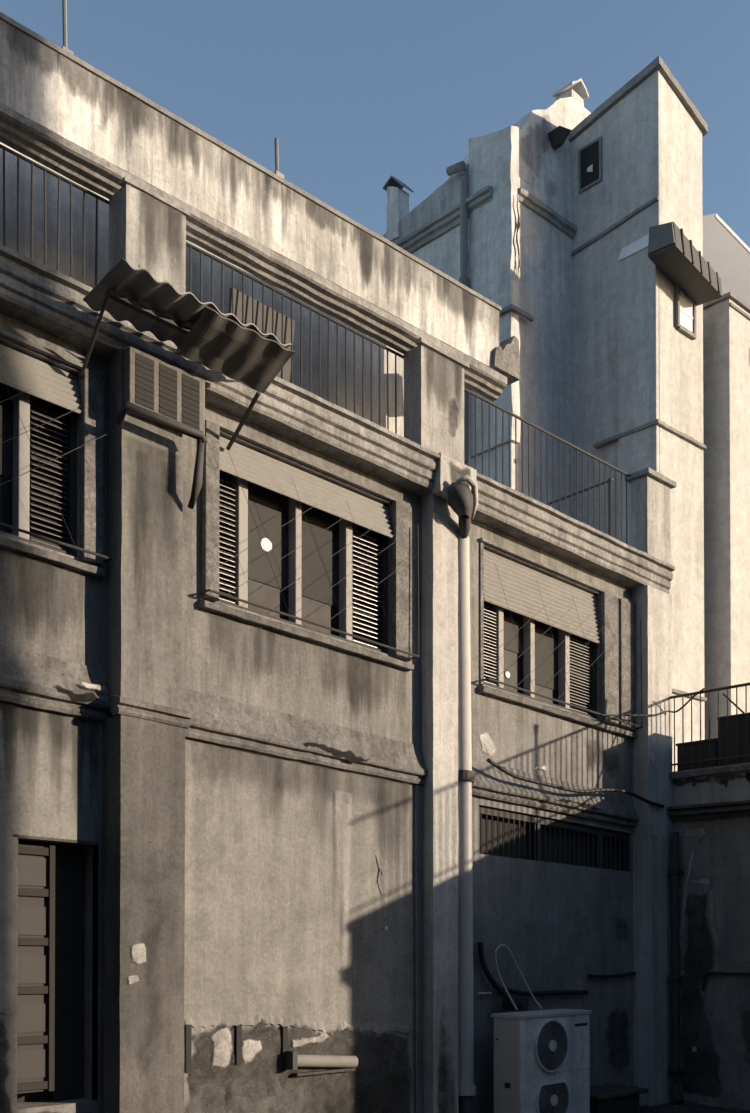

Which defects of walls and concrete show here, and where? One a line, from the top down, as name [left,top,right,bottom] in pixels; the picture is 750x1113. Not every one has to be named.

leakage [29,37,91,97]
leakage [315,203,335,230]
leakage [360,230,372,275]
crack [514,194,522,274]
flaking render [0,998,12,1113]
flaking render [185,1013,413,1113]